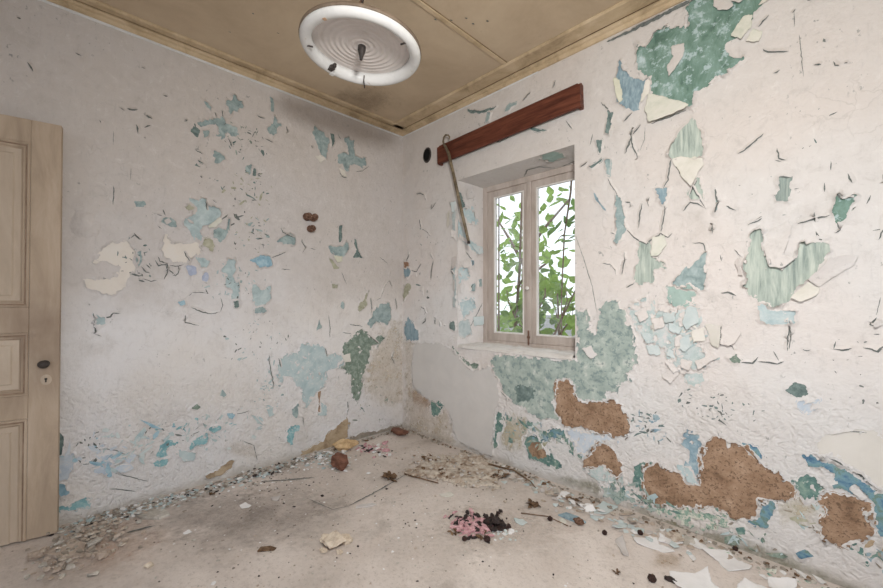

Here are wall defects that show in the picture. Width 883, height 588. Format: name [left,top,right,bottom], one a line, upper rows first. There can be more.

peeling [59,92,402,516]
peeling [403,315,421,343]
peeling [402,260,429,303]
peeling [446,0,883,588]